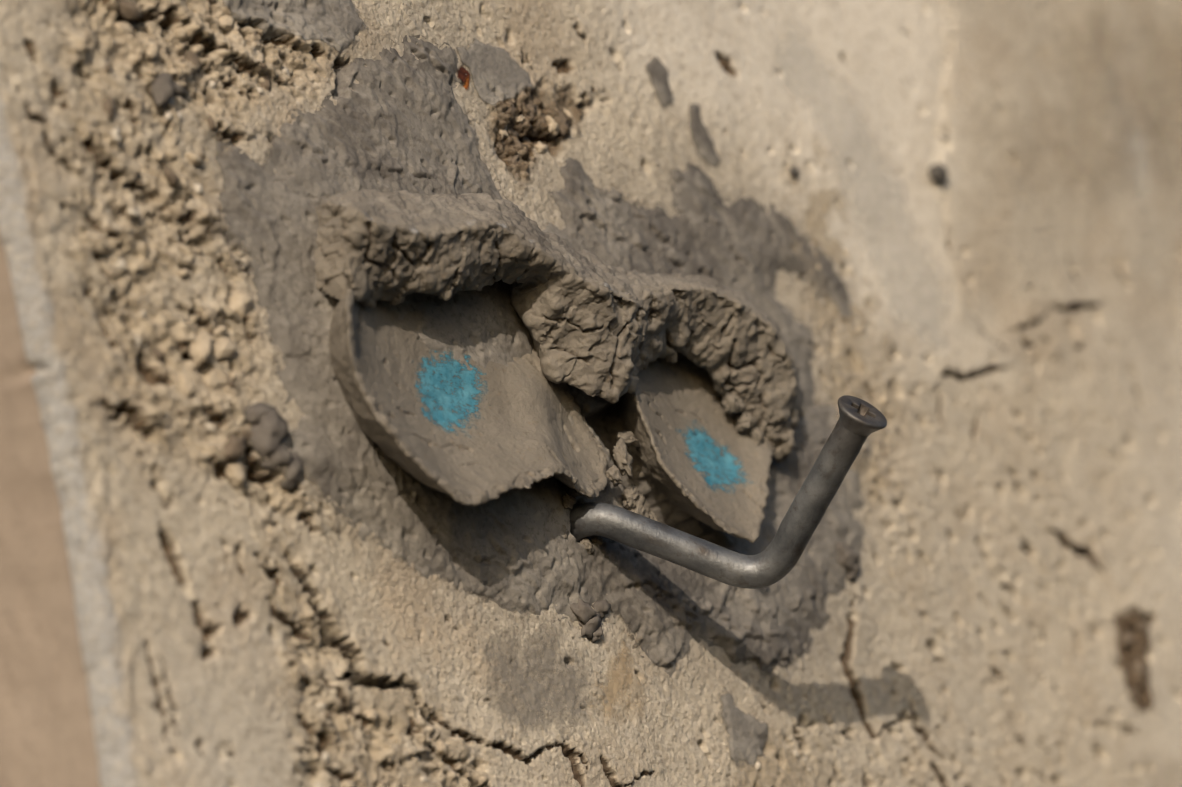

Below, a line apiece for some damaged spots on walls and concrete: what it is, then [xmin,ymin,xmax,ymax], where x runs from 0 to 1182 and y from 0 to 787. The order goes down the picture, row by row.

spalling [23,29,35,62]
spalling [494,88,603,178]
spalling [50,0,330,531]
spalling [805,190,849,273]
spalling [817,295,906,504]
crack [936,256,1100,445]
crack [143,638,178,742]
crack [269,570,654,787]
crack [839,594,947,787]